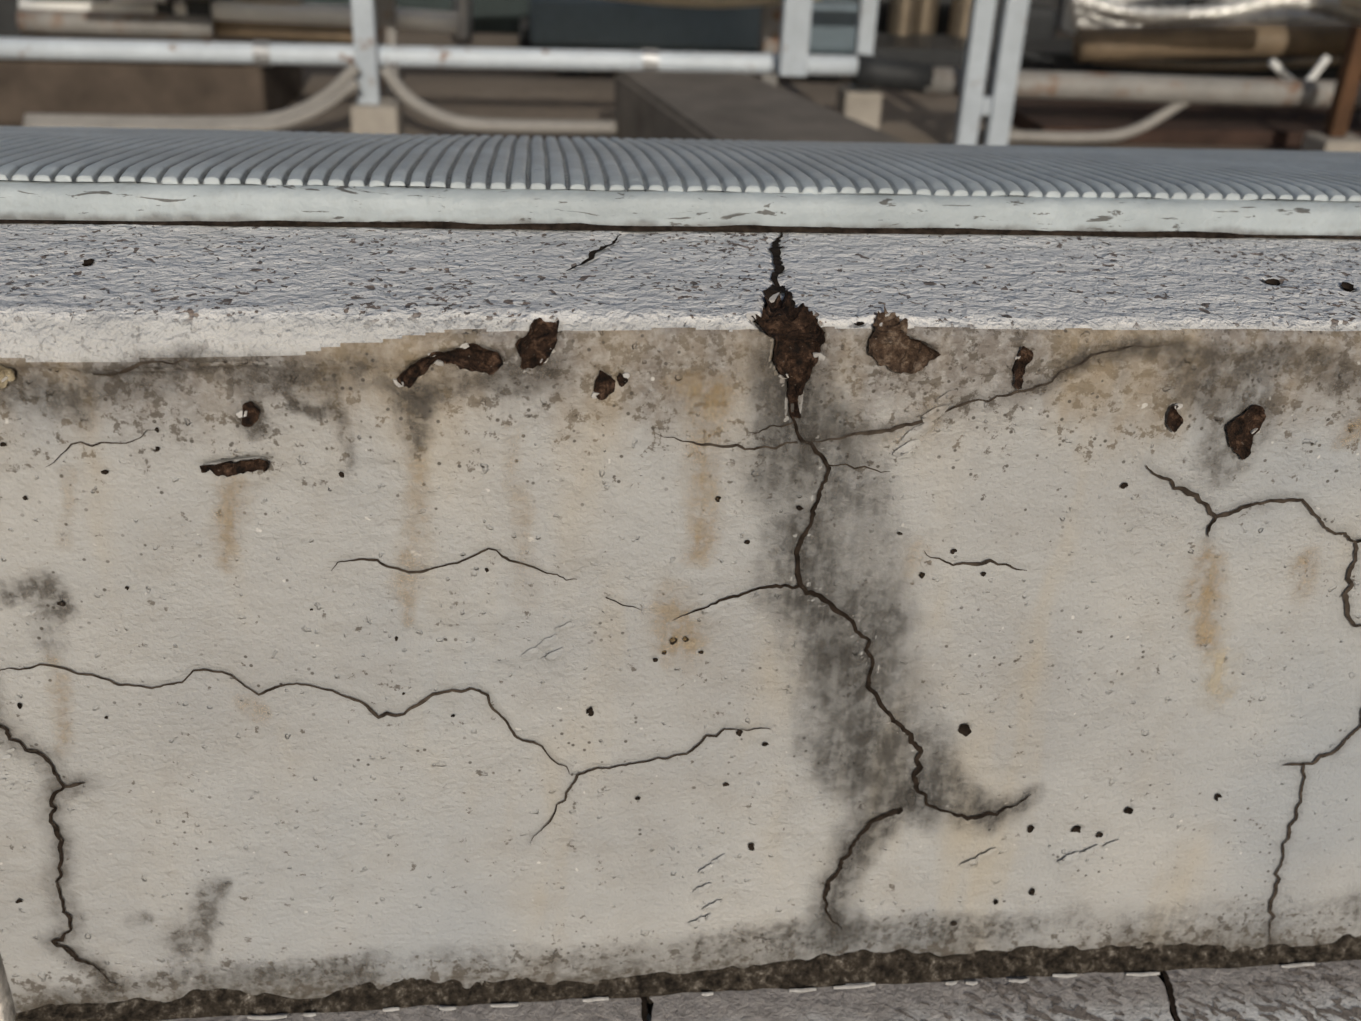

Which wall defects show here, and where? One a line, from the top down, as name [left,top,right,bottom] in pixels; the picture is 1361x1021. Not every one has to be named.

crack [763,232,796,309]
spalling [746,291,825,419]
spalling [868,305,941,374]
crack [331,548,577,581]
leakage [759,340,855,626]
crack [655,345,1167,929]
crack [1146,465,1361,627]
crack [0,725,117,988]
crack [0,664,771,843]
leakage [805,613,1026,945]
crack [1269,712,1361,944]
crack [1162,971,1180,1021]